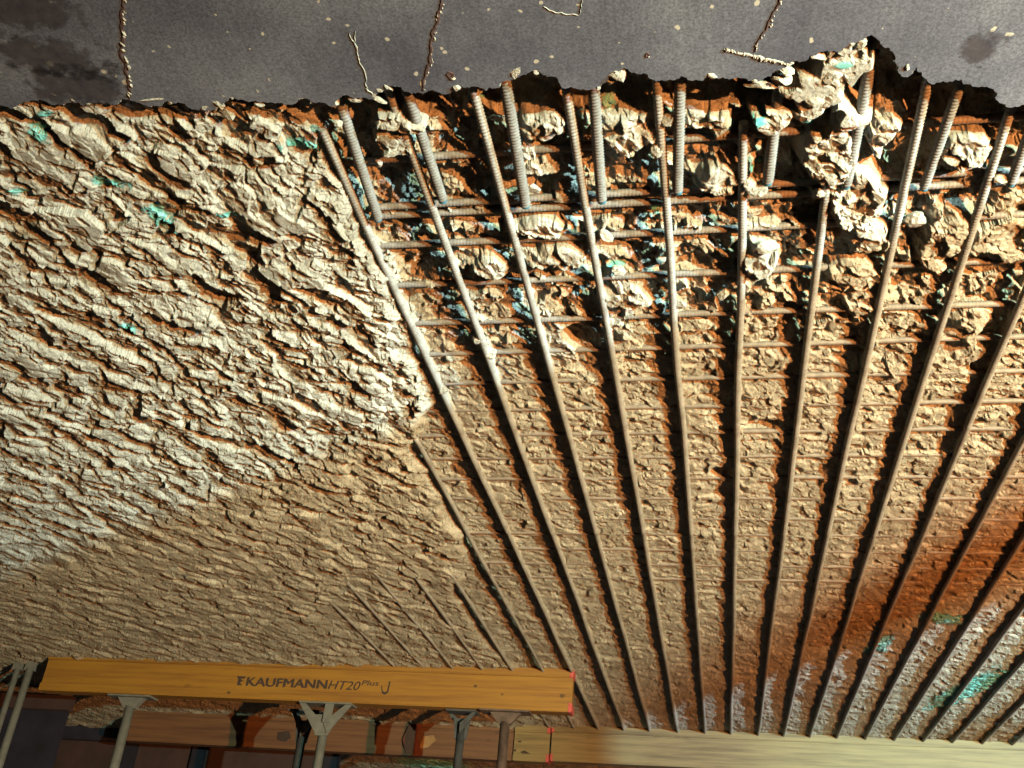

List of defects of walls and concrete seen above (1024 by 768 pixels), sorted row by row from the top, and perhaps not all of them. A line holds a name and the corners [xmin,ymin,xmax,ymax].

damp [0,0,128,141]
crack [119,0,133,100]
crack [349,31,373,94]
crack [422,0,445,91]
crack [724,0,787,66]
damp [963,35,1001,62]
spalling [344,71,485,203]
spalling [571,68,675,200]
spalling [670,35,923,373]
spalling [381,120,1024,743]
damp [864,635,894,656]
damp [923,666,1010,711]